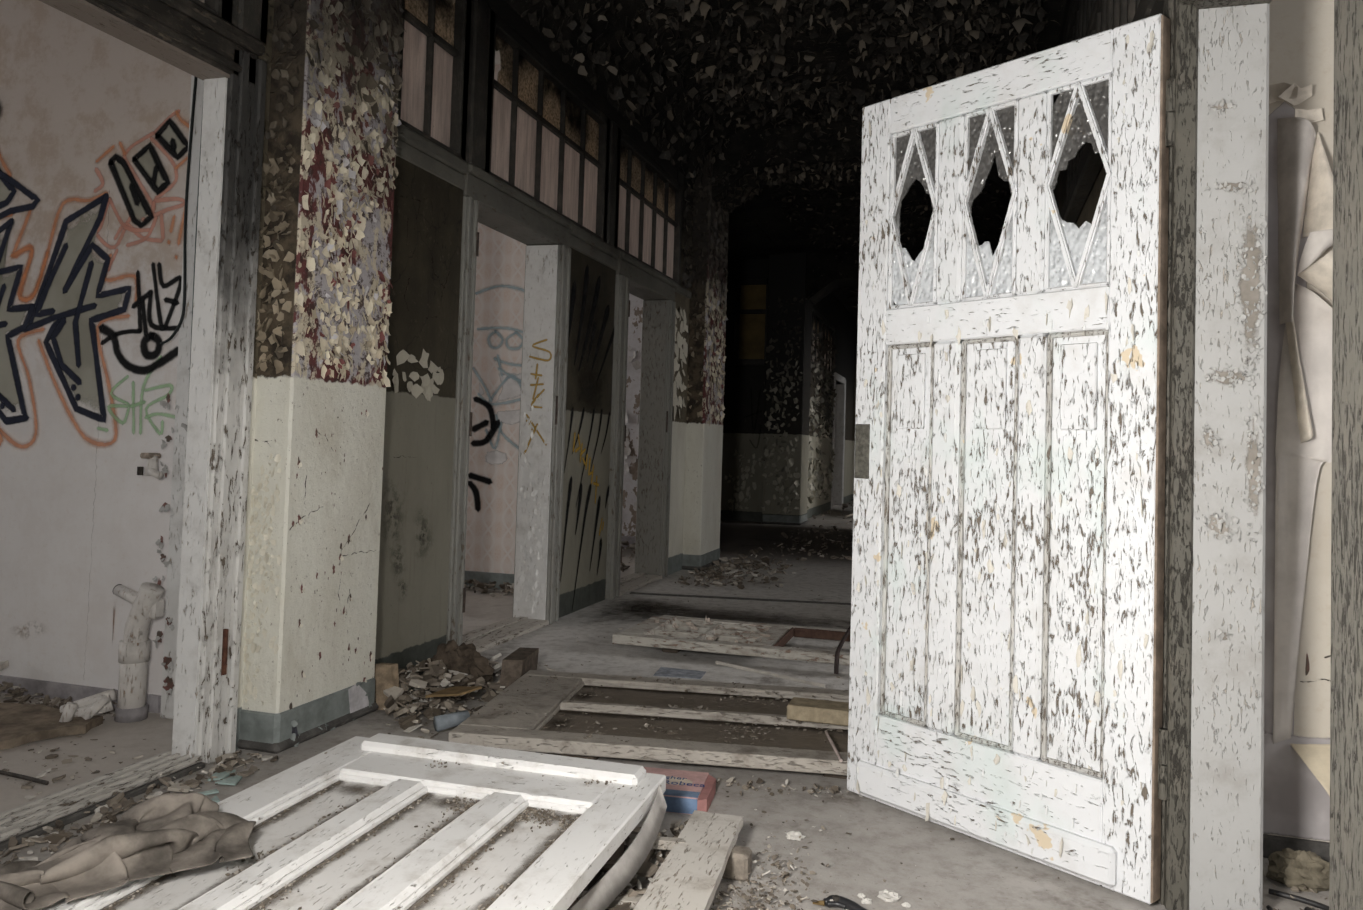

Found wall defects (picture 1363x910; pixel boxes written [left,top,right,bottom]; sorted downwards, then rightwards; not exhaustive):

peeling [254,0,444,401]
peeling [514,0,1059,249]
peeling [842,261,888,323]
peeling [624,412,639,474]
flaking render [1199,102,1330,841]
peeling [301,534,352,593]
crack [338,503,374,613]
peeling [853,458,946,707]
peeling [1048,568,1125,729]